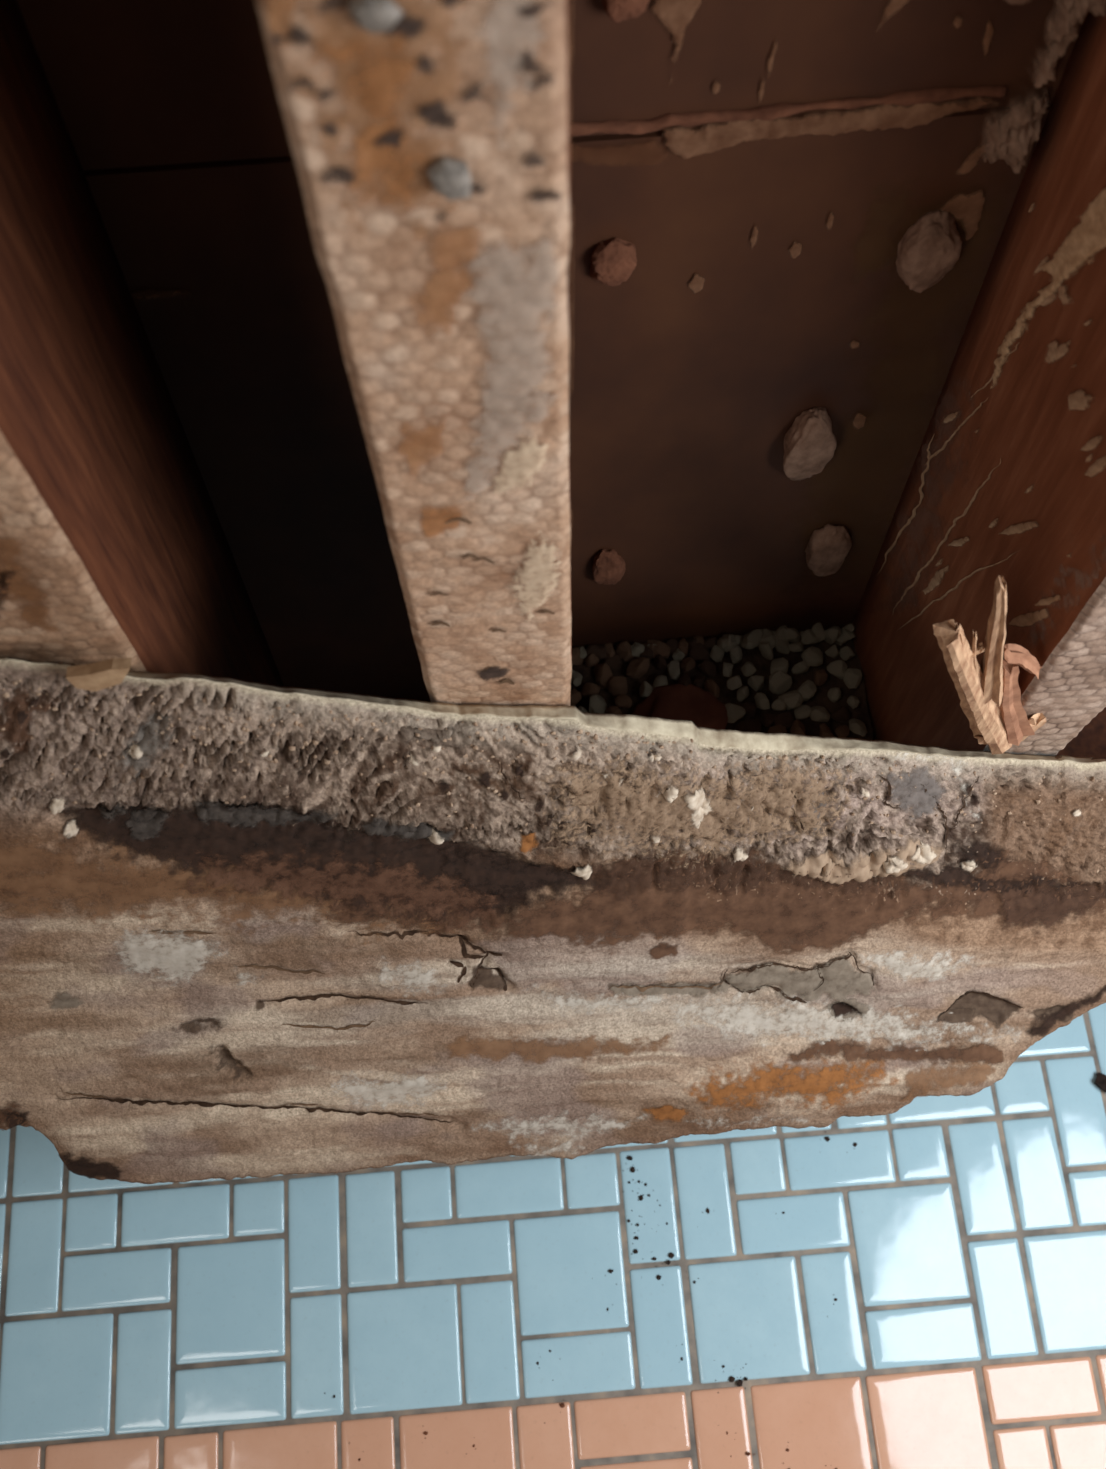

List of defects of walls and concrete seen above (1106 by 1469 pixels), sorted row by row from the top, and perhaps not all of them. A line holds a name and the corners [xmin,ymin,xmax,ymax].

peeling [570,97,997,166]
rust [421,507,462,537]
spalling [479,747,980,884]
leakage [0,796,1106,981]
crack [236,965,429,1030]
crack [353,930,507,991]
leakage [449,992,990,1063]
peeling [608,952,875,1017]
spalling [937,991,1073,1028]
crack [57,1092,460,1123]
leakage [486,1114,625,1156]
rust [644,1039,1004,1121]